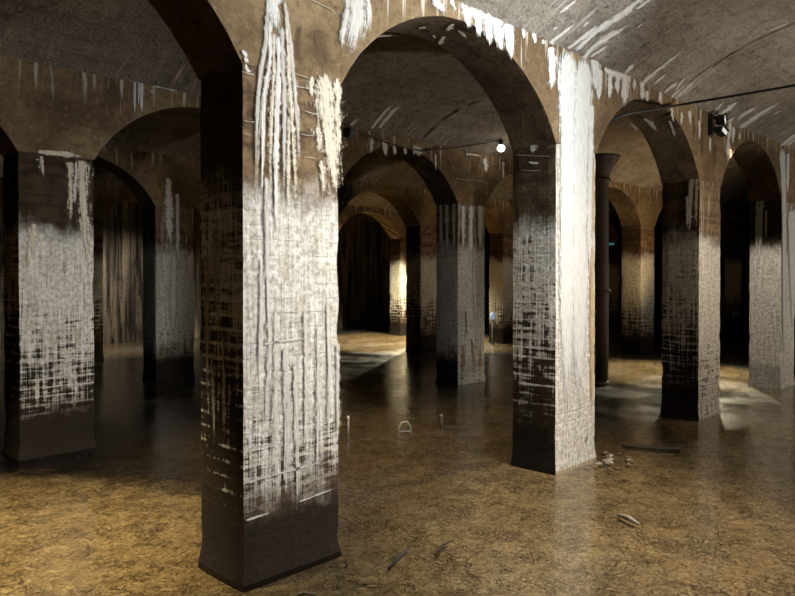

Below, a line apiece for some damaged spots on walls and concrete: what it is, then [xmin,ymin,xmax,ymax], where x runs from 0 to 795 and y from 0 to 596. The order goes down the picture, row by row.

damp [163,178,180,335]
damp [249,0,341,502]
damp [369,106,422,155]
damp [432,0,781,419]